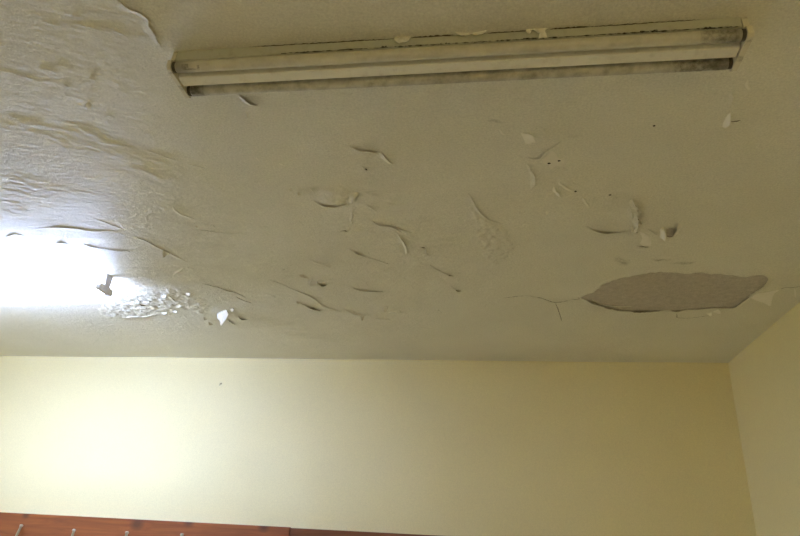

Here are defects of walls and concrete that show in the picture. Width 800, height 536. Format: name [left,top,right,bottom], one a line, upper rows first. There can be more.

flaking render [97,285,248,326]
spalling [577,268,784,313]